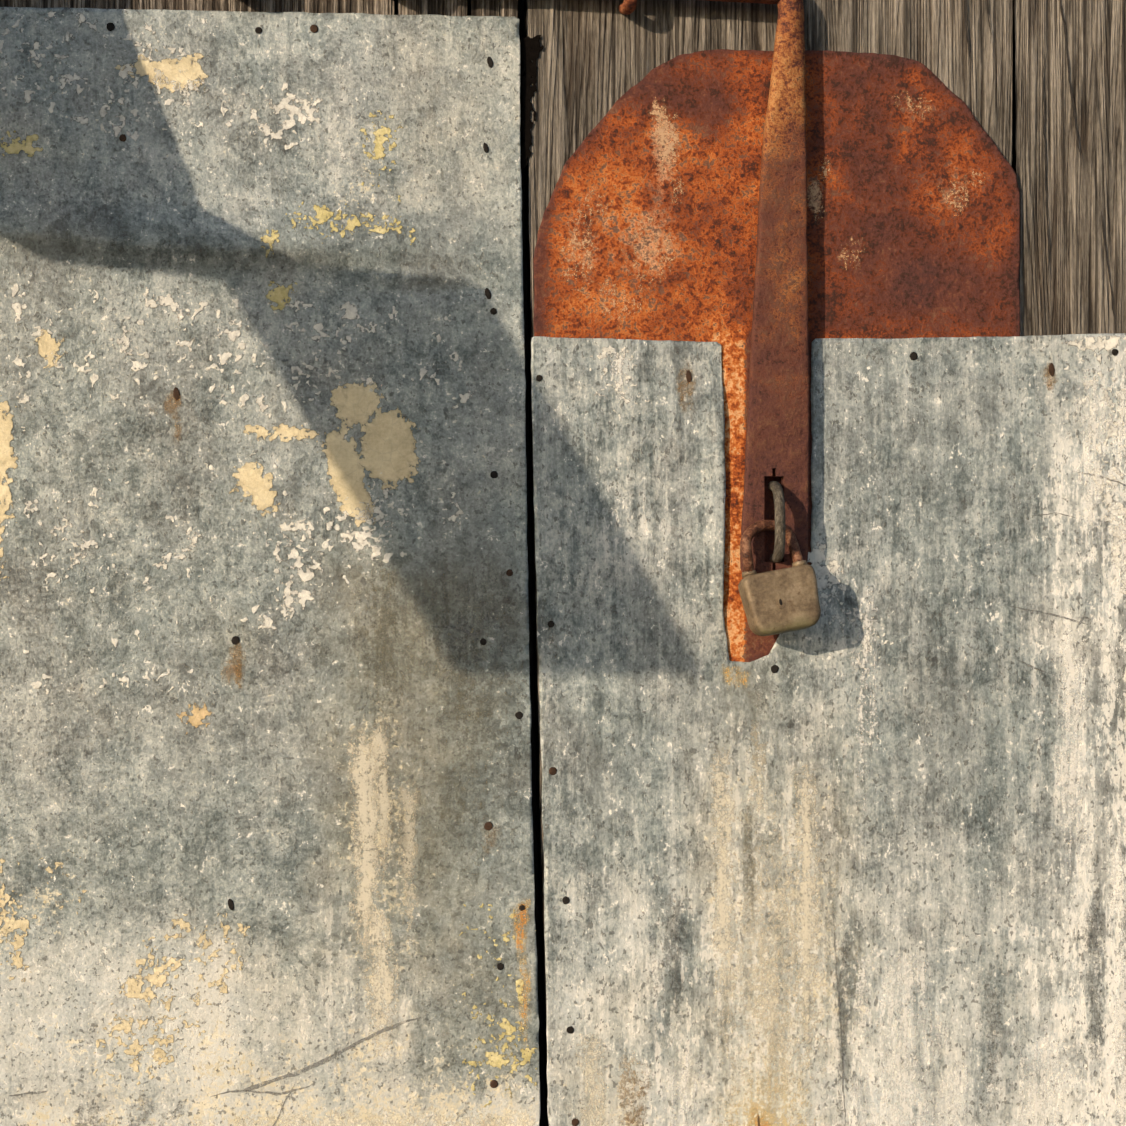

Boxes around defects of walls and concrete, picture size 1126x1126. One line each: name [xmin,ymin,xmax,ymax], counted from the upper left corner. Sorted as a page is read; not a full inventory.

peeling [0,9,209,144]
peeling [221,81,322,156]
peeling [360,110,404,187]
peeling [286,199,416,245]
peeling [4,284,100,398]
peeling [0,393,111,592]
peeling [92,281,423,629]
peeling [97,657,194,692]
peeling [0,858,37,982]
peeling [91,913,250,1091]
peeling [456,903,537,1107]
rust [729,1080,806,1126]